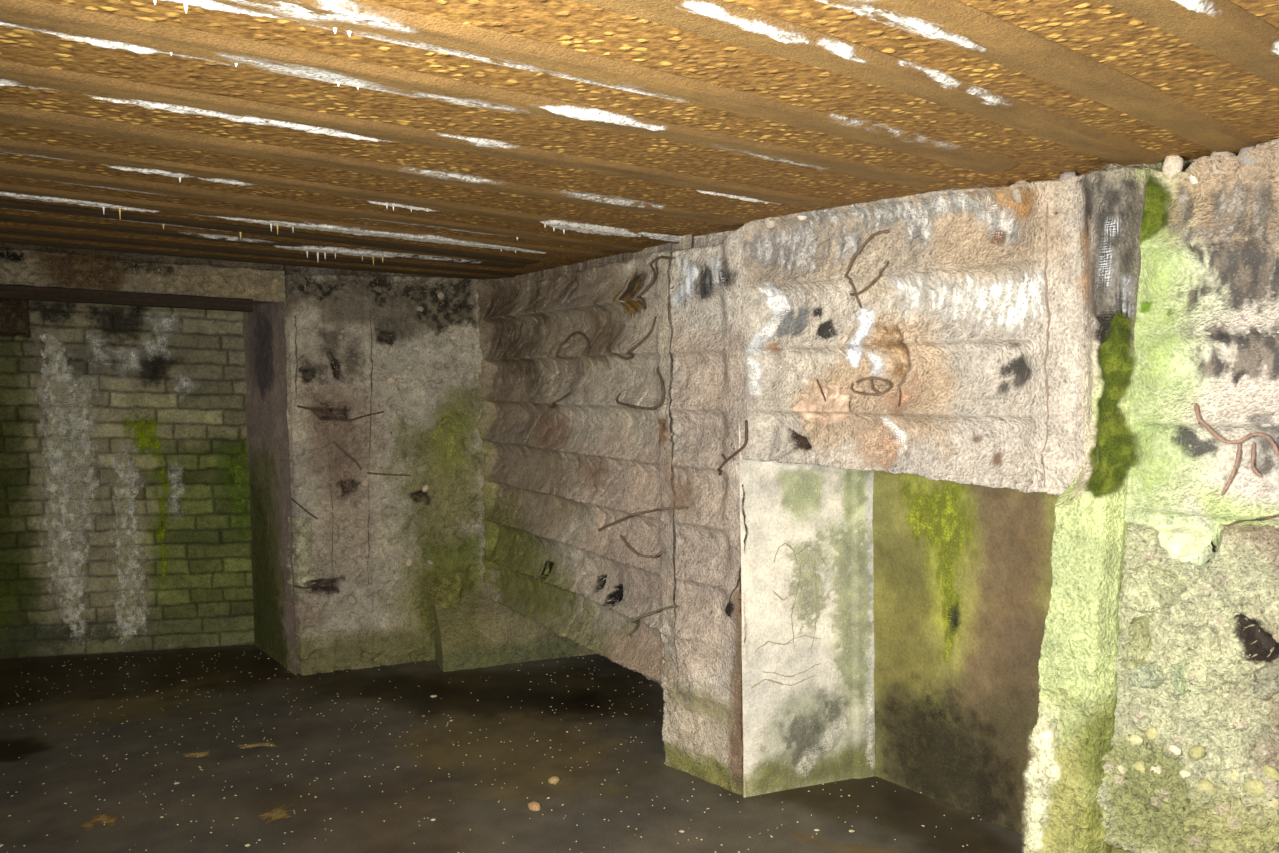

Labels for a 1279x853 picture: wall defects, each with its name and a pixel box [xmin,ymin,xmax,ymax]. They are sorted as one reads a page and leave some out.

damp [0,22,200,59]
damp [160,0,533,71]
damp [685,2,865,63]
damp [816,0,985,51]
damp [223,55,515,110]
damp [87,95,390,142]
damp [540,106,665,131]
damp [540,220,684,242]
rust [613,272,646,317]
damp [1189,325,1279,383]
rust [658,419,666,443]
spalling [1096,523,1279,853]